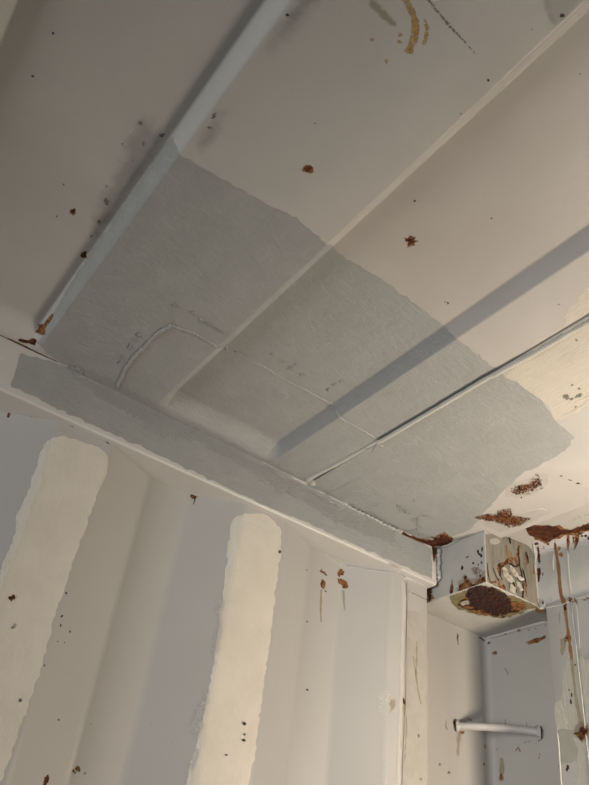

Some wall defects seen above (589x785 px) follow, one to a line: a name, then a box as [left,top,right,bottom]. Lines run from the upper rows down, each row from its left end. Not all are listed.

rust [18,313,53,346]
rust [505,473,548,498]
rust [402,532,453,562]
rust [449,547,501,616]
rust [476,508,589,659]
rust [573,725,589,741]